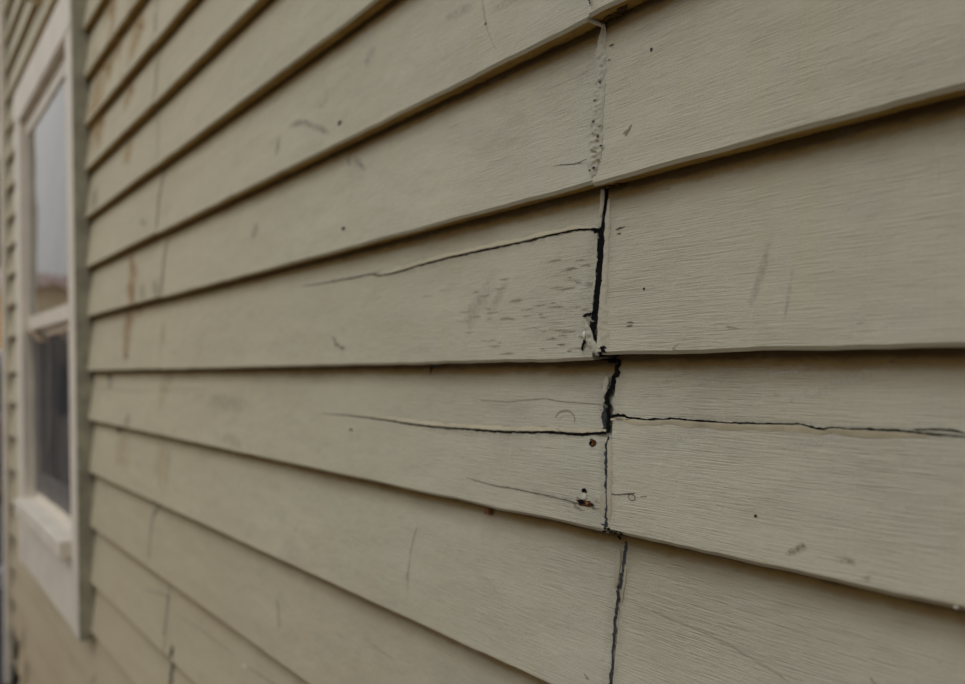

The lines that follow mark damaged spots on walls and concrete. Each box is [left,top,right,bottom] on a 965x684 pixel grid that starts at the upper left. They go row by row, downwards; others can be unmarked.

crack [306,185,965,684]